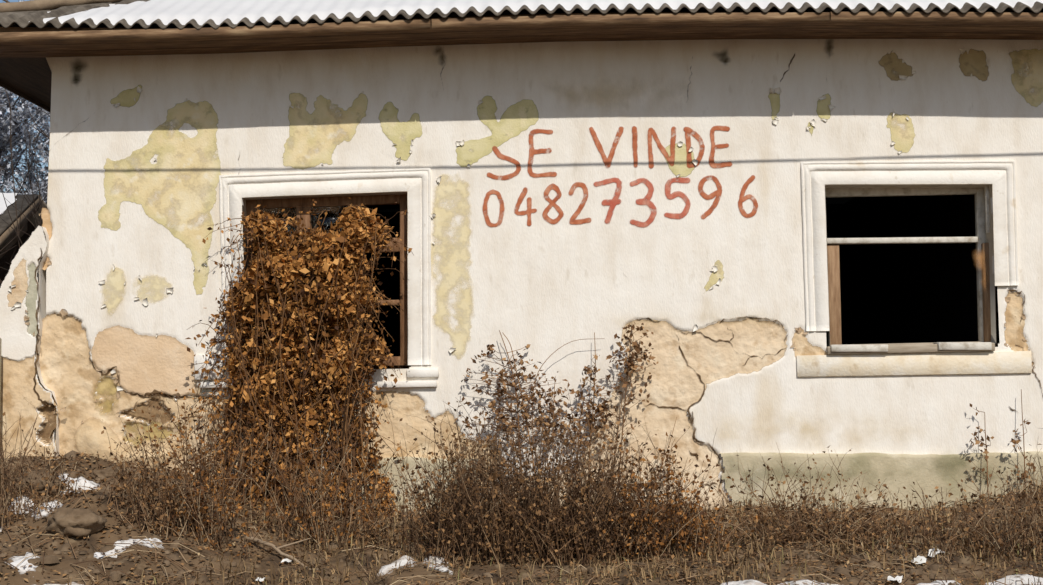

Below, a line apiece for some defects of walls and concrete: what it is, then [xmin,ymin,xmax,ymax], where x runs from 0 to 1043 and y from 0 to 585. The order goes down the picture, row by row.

flaking render [41,208,52,240]
crack [33,248,60,440]
flaking render [0,254,257,479]
peeling [98,98,221,295]
peeling [283,91,368,170]
peeling [379,102,422,162]
peeling [429,175,473,359]
peeling [456,96,539,167]
flaking render [509,318,827,510]
crack [638,316,788,503]
flaking render [1004,291,1033,365]
crack [1008,289,1043,394]